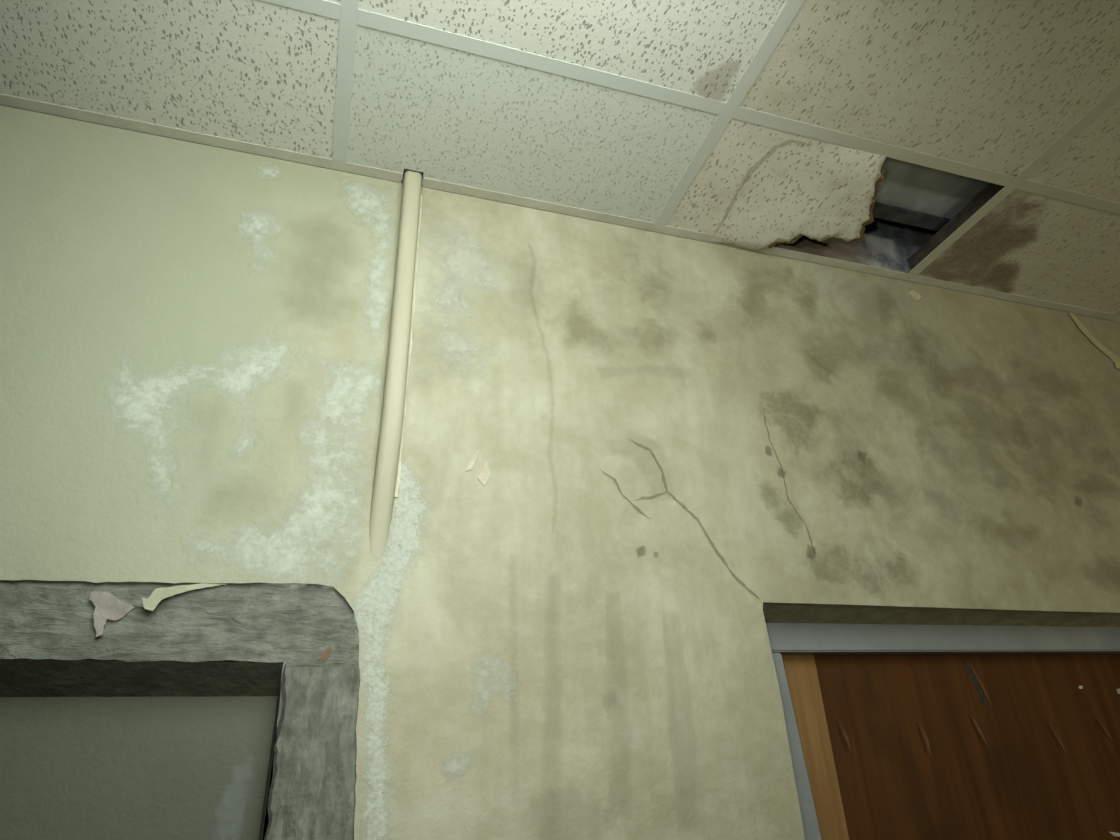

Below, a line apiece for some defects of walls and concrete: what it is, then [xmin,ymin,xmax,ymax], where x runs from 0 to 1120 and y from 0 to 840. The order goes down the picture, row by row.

water stain [348,187,388,328]
water stain [923,196,1035,293]
water stain [116,345,286,482]
water stain [198,362,380,577]
flaking render [0,581,360,840]
water stain [356,464,425,840]